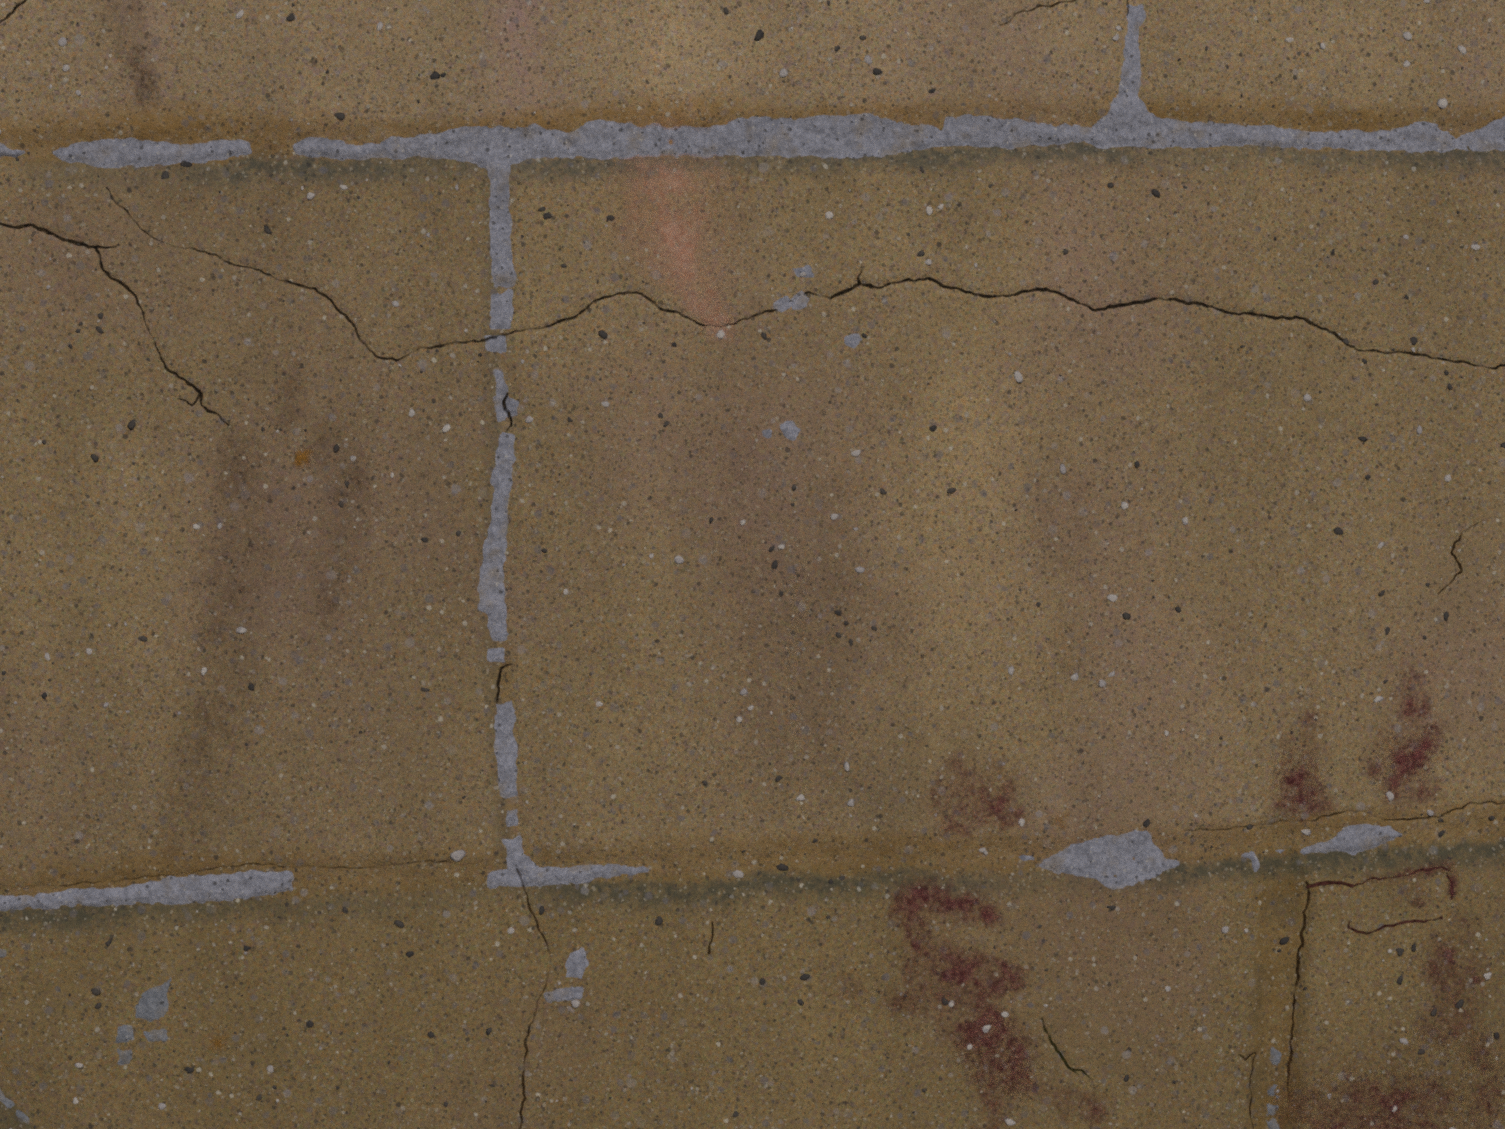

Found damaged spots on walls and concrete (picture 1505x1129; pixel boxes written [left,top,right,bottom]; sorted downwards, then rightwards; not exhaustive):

crack [0,0,26,23]
crack [1001,0,1075,25]
crack [0,187,1505,430]
crack [1438,535,1463,594]
rust [1371,699,1437,800]
crack [516,867,547,943]
rust [894,885,1031,1105]
crack [1239,881,1311,1129]
crack [519,1026,530,1129]